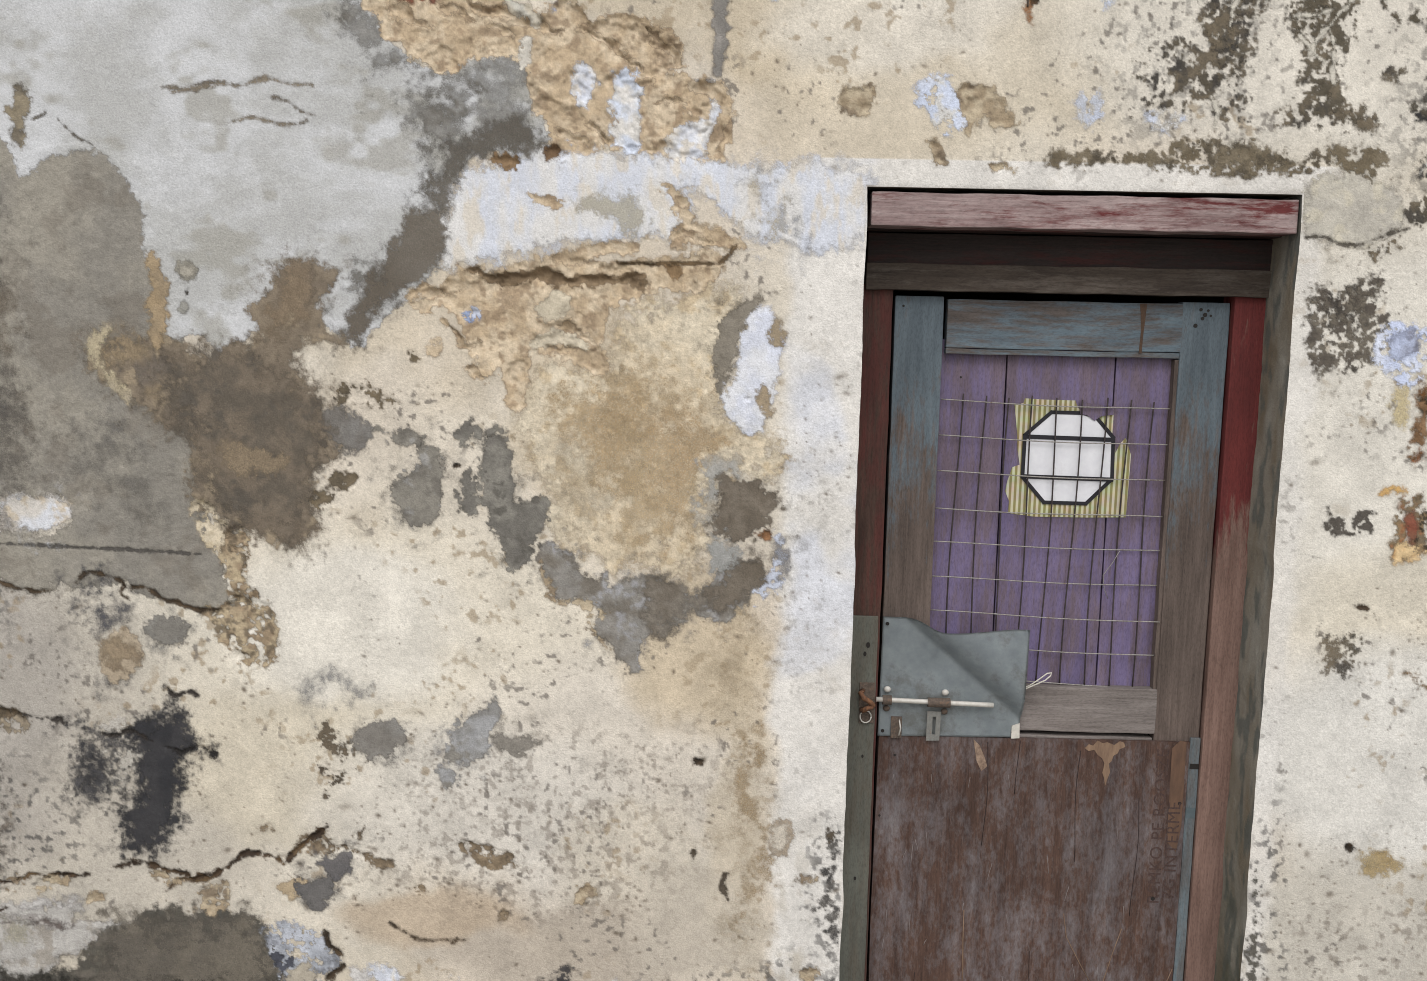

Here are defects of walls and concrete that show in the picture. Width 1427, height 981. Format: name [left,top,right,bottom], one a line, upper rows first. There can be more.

spalling [4,83,30,148]
spalling [361,0,737,164]
leakage [1043,0,1390,183]
leakage [1303,157,1427,380]
leakage [80,250,373,552]
peeling [404,182,790,582]
crack [0,570,217,613]
crack [163,684,200,698]
crack [101,728,218,759]
crack [0,823,329,917]
spalling [458,841,515,871]
leakage [0,901,285,981]